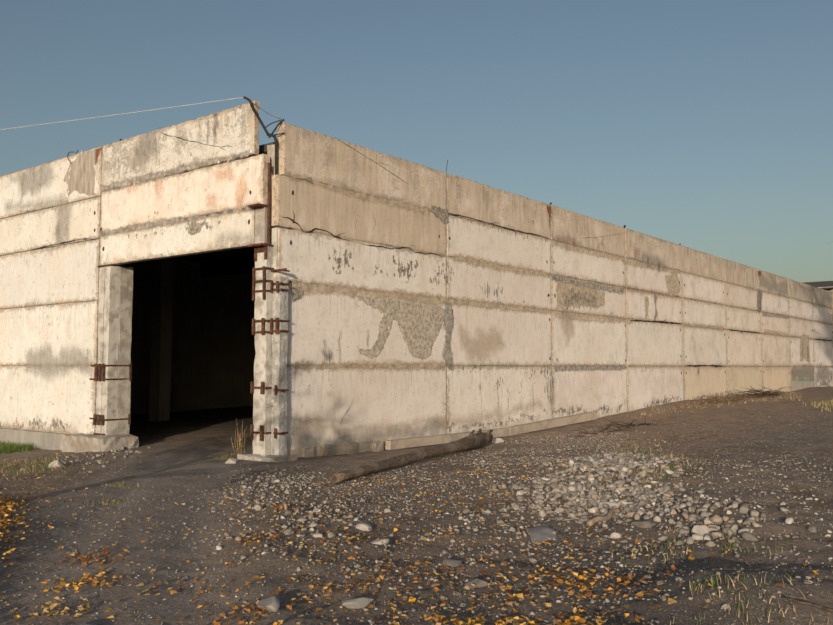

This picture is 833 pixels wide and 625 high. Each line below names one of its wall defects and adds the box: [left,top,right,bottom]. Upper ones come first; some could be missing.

spalling [289,175,450,223]
crack [279,208,446,257]
peeling [328,248,357,275]
peeling [545,240,680,296]
flaking render [291,255,632,373]